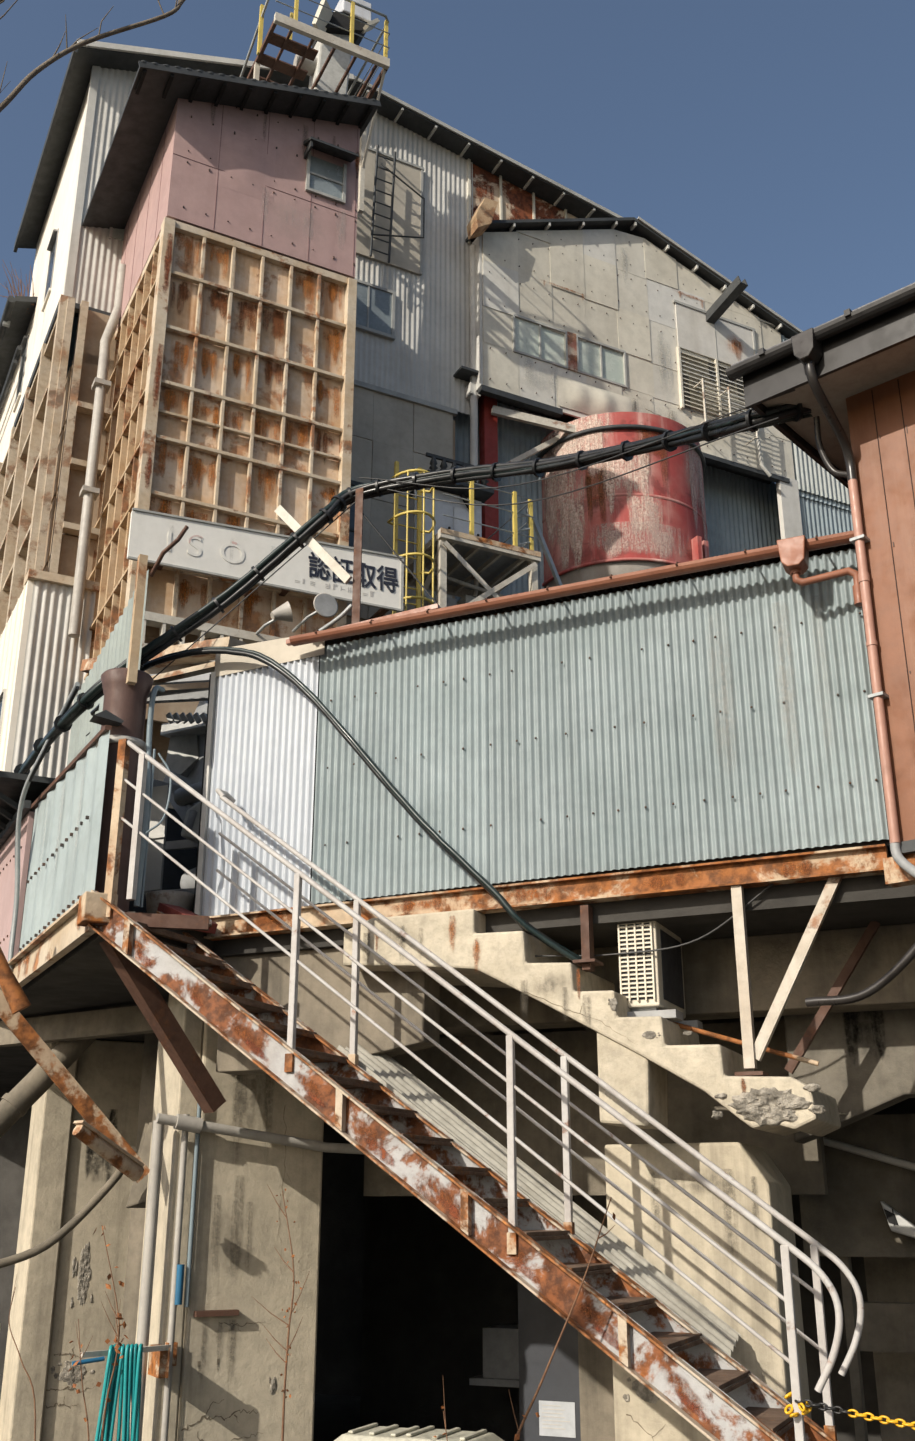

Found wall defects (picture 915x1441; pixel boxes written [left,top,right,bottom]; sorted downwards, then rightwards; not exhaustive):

rust [163,233,228,312]
rust [211,290,284,341]
rust [153,342,333,461]
rust [318,380,340,414]
rust [145,444,215,521]
rust [585,463,609,519]
rust [232,1019,264,1058]
rust [297,1074,324,1107]
spalling [711,1083,826,1127]
rust [359,1125,393,1165]
rust [428,1179,458,1219]
crack [181,1399,263,1441]